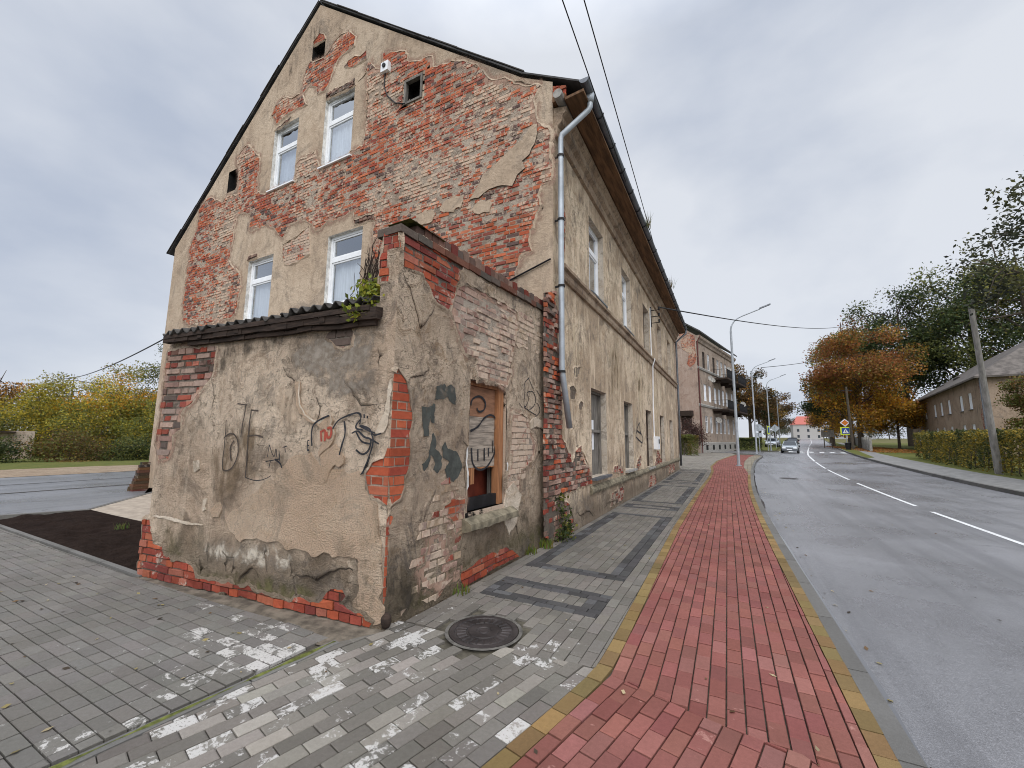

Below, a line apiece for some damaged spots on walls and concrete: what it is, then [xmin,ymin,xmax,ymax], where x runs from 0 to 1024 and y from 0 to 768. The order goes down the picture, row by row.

spalling [182,30,592,615]
efflorescence [210,545,289,566]
flaking render [136,328,415,628]